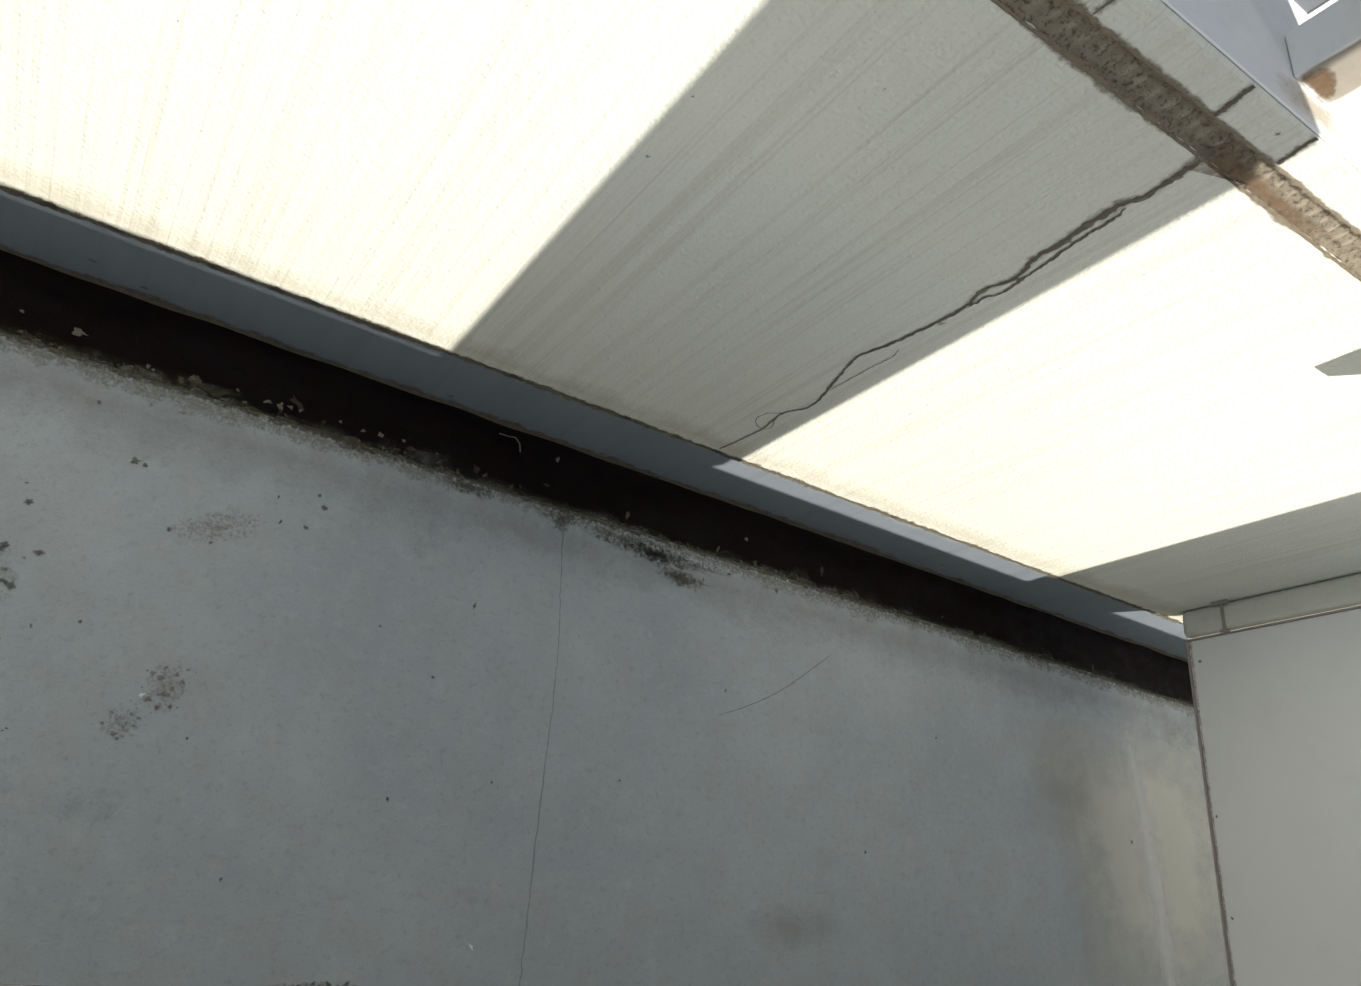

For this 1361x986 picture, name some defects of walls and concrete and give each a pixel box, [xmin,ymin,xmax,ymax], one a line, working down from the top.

crack [1214,85,1256,116]
crack [719,149,1219,449]
water stain [0,244,1188,662]